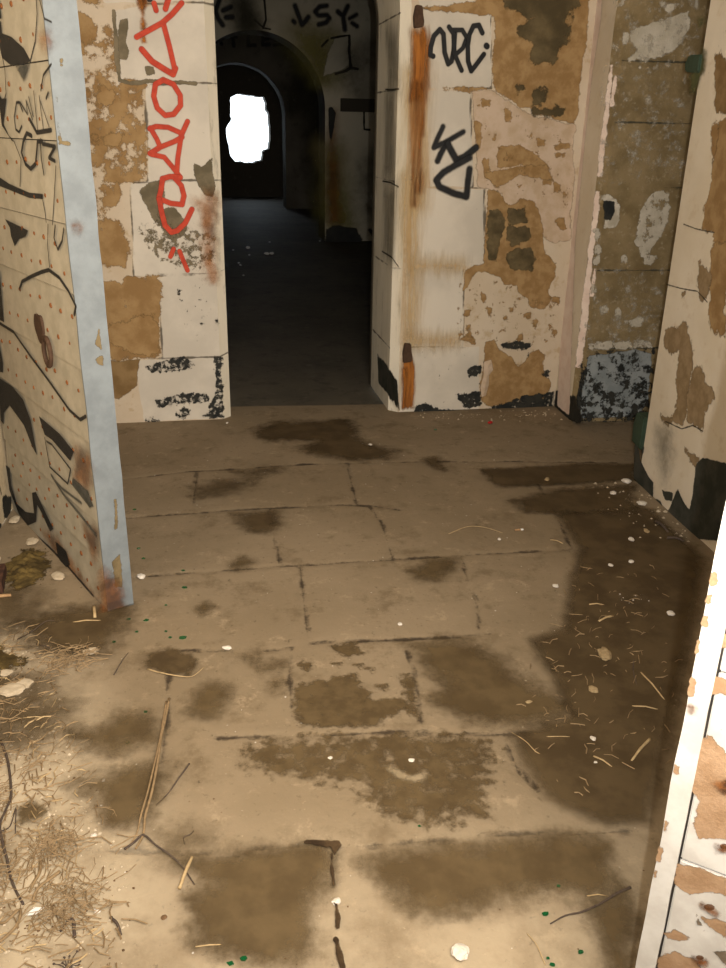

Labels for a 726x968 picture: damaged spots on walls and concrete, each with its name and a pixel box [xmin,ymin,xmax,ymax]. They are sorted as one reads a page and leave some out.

peeling [78,0,216,399]
rust [404,27,457,344]
peeling [697,53,726,338]
peeling [145,356,225,422]
damp [256,419,393,460]
rust [402,358,415,409]
rust [100,578,124,611]
damp [238,464,703,828]
peeling [692,735,726,840]
damp [183,844,334,965]
damp [370,832,640,968]
peeling [674,864,726,896]